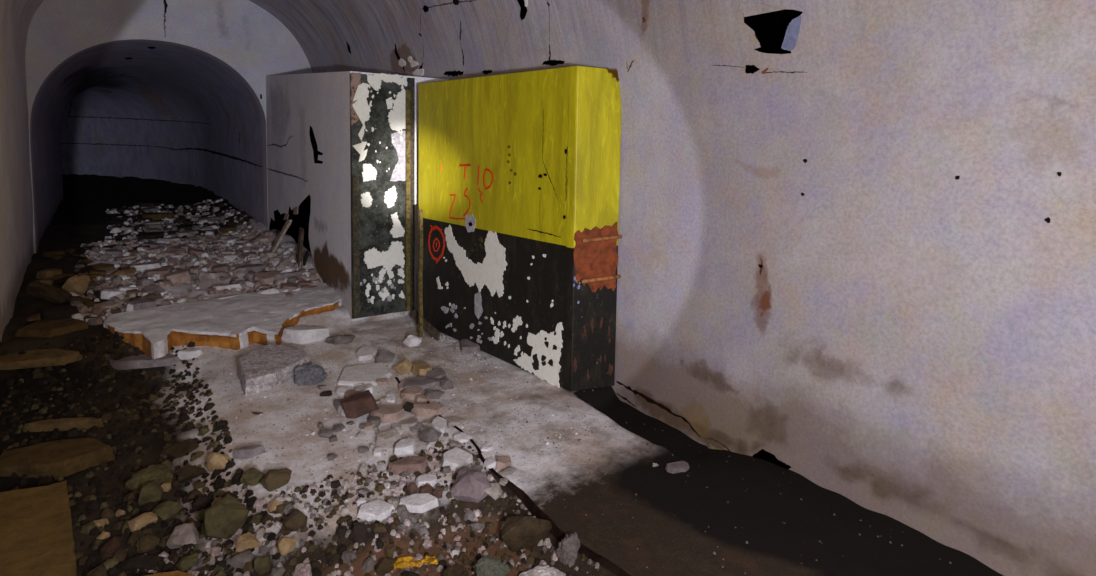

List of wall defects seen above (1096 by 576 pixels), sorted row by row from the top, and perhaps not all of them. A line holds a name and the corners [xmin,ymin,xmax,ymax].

crack [161,0,169,37]
spalling [739,2,803,54]
spalling [745,65,769,74]
corrosion [760,292,771,310]
crack [616,381,730,451]
crack [427,401,631,576]